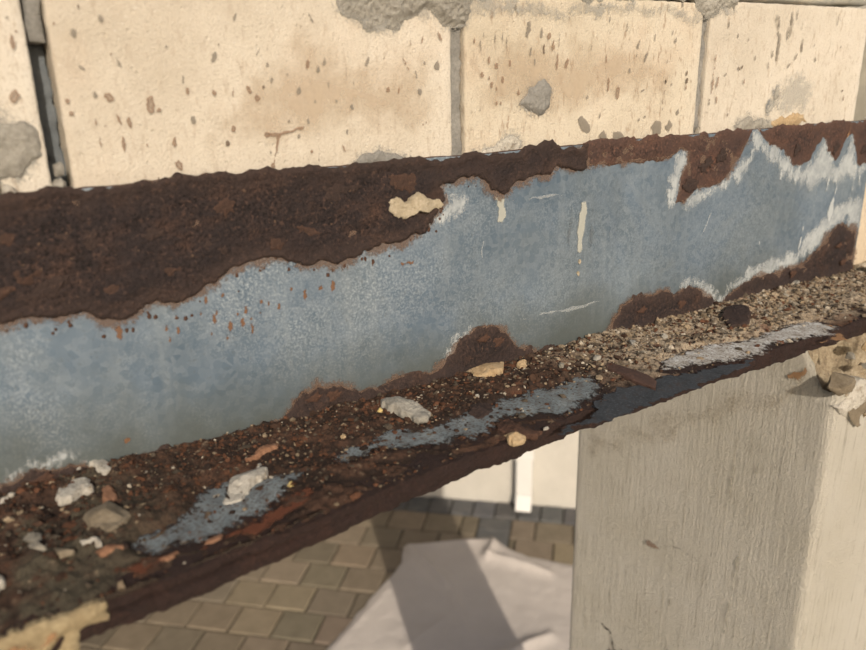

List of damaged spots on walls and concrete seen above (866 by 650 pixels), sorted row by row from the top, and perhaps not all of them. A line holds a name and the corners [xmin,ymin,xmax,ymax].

corrosion [0,119,866,342]
corrosion [274,325,555,422]
corrosion [787,368,807,380]
peeling [337,322,838,462]
corrosion [497,419,542,441]
corrosion [0,463,89,495]
flaking render [55,477,94,507]
flaking render [89,459,111,476]
corrosion [102,485,117,503]
corrosion [245,443,278,462]
corrosion [201,488,313,549]
corrosion [95,544,124,557]